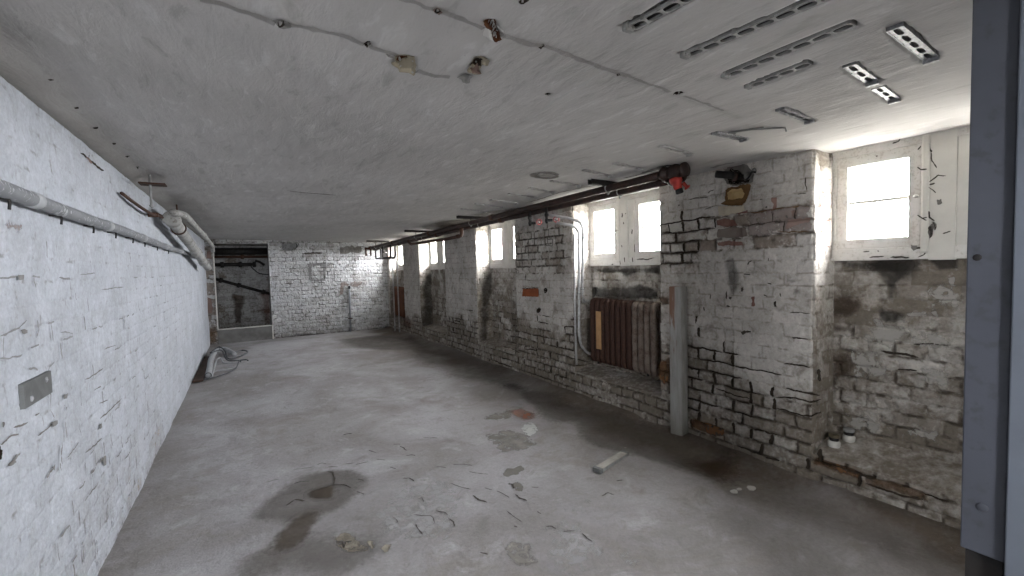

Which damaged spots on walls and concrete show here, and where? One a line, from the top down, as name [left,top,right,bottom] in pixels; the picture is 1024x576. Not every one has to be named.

peeling [612,164,830,265]
damp [422,275,433,326]
damp [481,274,492,341]
damp [592,266,659,300]
peeling [726,260,781,307]
damp [872,262,909,294]
damp [833,277,963,377]
peeling [688,295,821,461]
damp [255,472,360,568]